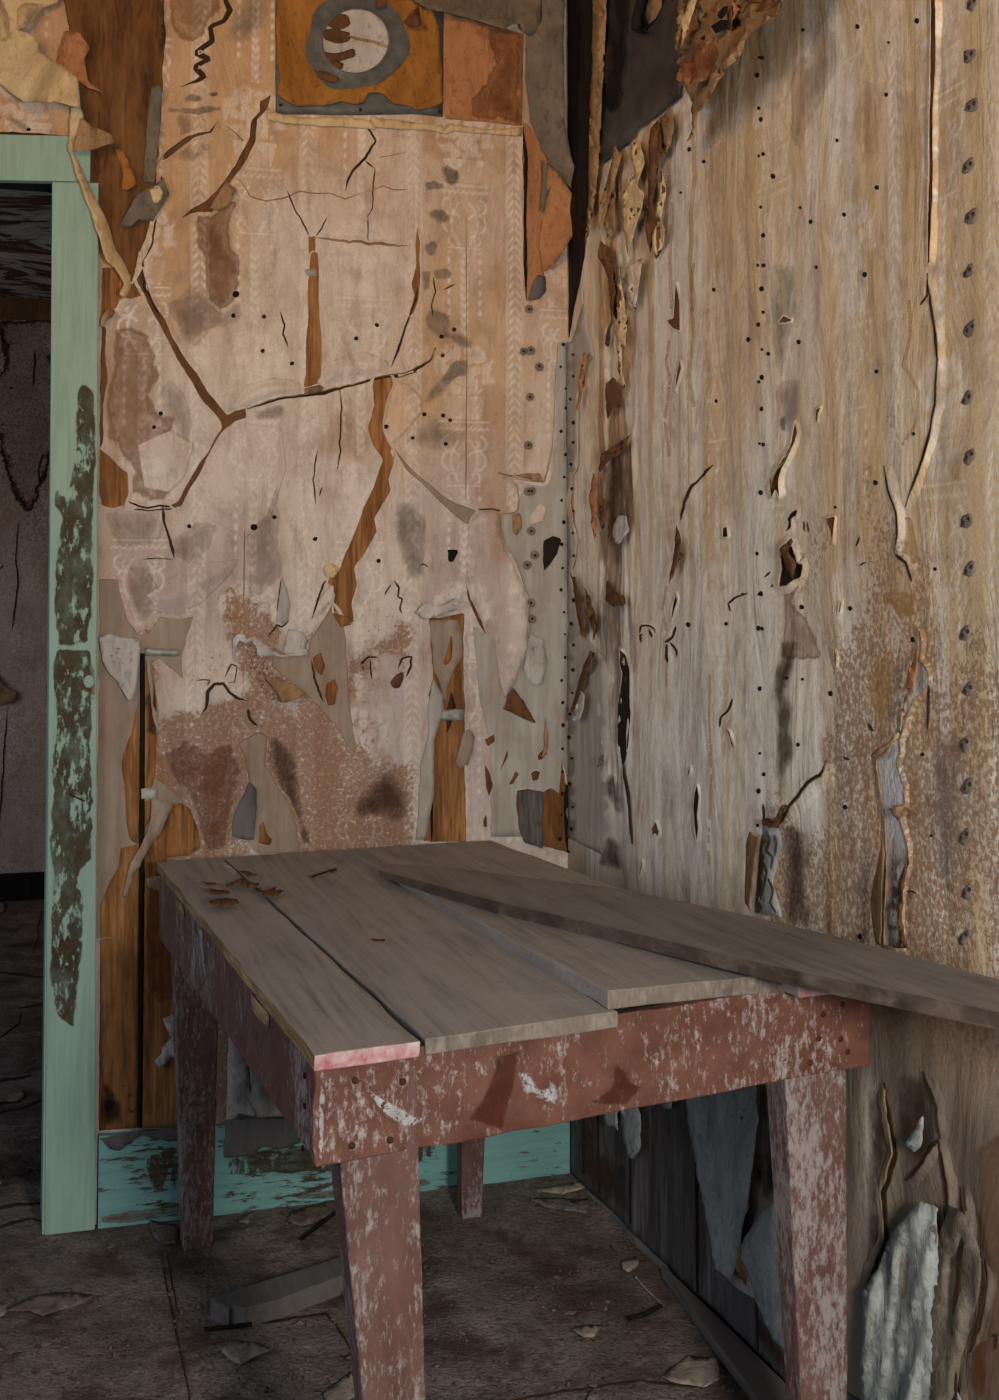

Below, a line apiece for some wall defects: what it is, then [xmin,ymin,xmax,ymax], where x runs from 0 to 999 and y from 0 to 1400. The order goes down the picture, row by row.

crack [181,0,237,90]
crack [239,117,407,240]
peeling [598,142,667,419]
crack [883,0,947,582]
crack [128,164,454,680]
peeling [589,473,629,545]
peeling [50,385,140,1025]
crack [196,657,263,727]
peeling [467,510,536,723]
peeling [570,573,597,720]
peeling [745,832,760,911]
crack [261,1312,350,1350]